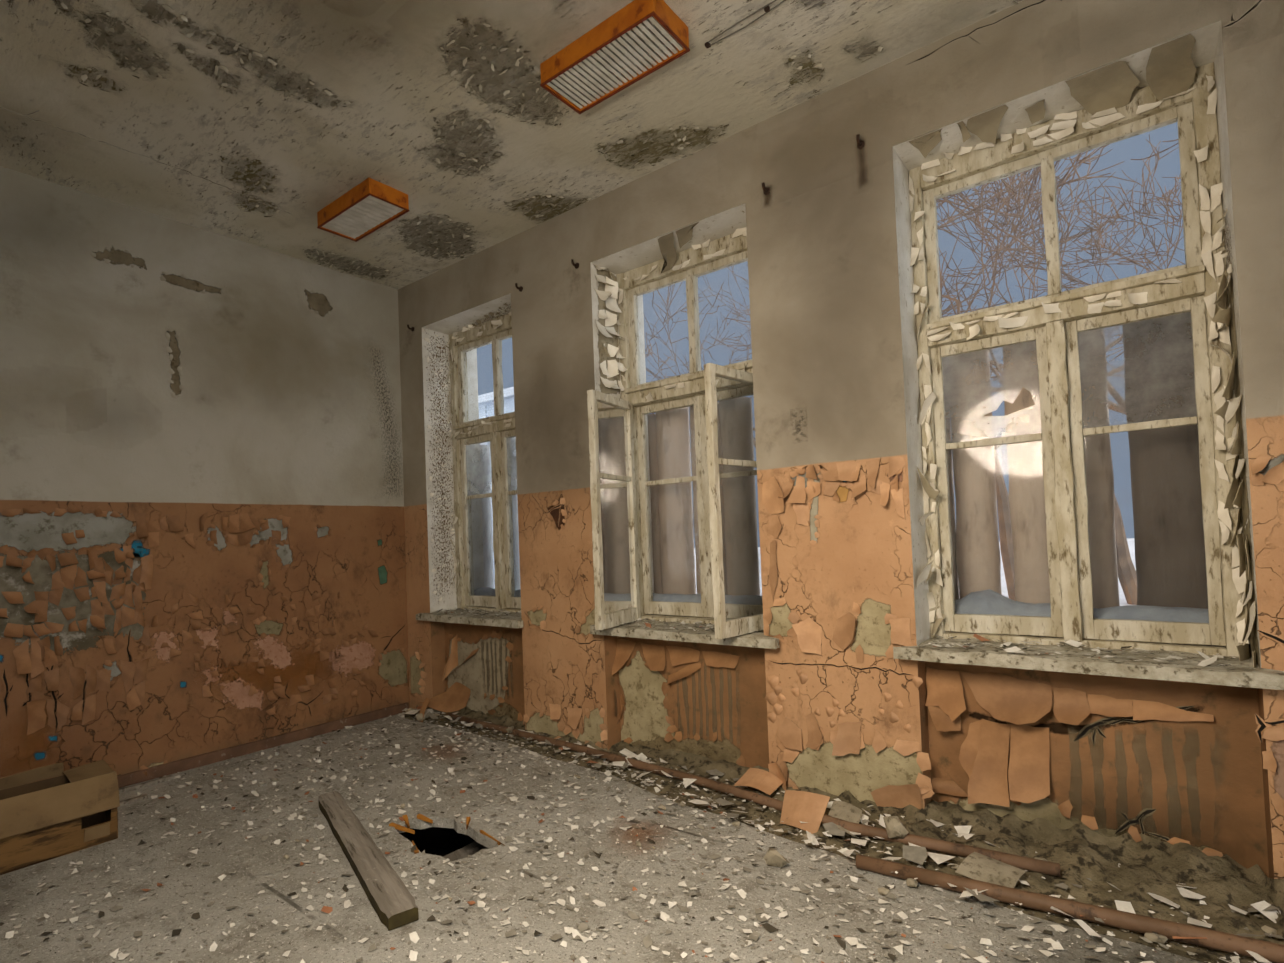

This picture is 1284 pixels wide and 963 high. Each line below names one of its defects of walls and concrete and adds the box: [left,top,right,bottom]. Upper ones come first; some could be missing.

crack [907,0,1062,65]
peeling [908,33,1217,267]
peeling [90,247,224,294]
peeling [304,289,333,317]
peeling [594,222,747,399]
peeling [165,329,184,398]
peeling [748,183,1284,669]
peeling [420,303,547,715]
crack [1,655,89,731]
crack [126,629,134,691]
peeling [523,618,740,748]
crack [1257,630,1284,646]